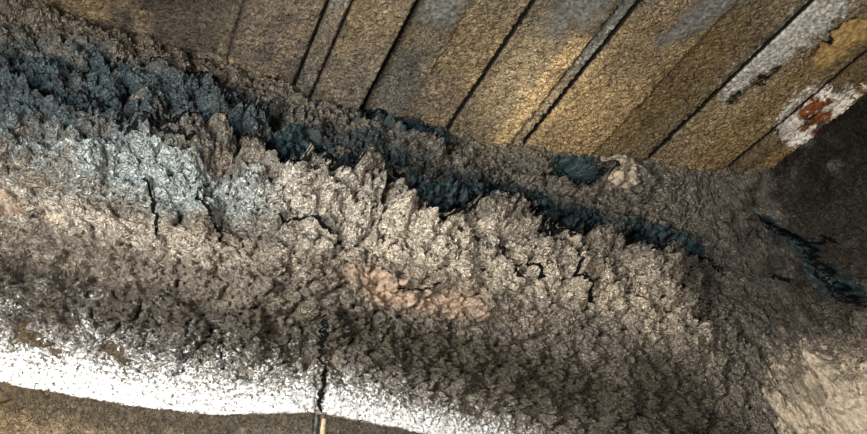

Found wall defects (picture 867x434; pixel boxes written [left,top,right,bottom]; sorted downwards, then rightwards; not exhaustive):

rust [794,95,838,136]
crack [0,56,720,304]
spalling [549,151,640,192]
crack [316,312,338,413]